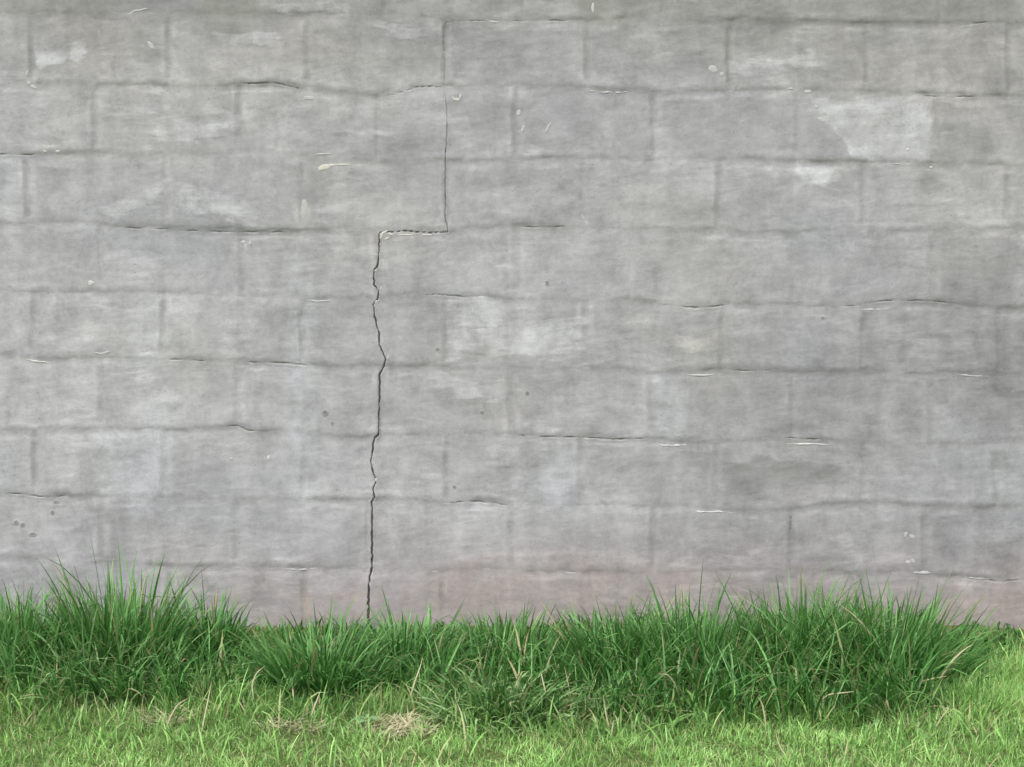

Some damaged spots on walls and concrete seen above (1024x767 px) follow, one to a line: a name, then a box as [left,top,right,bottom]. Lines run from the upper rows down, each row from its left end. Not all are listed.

crack [367,63,448,626]